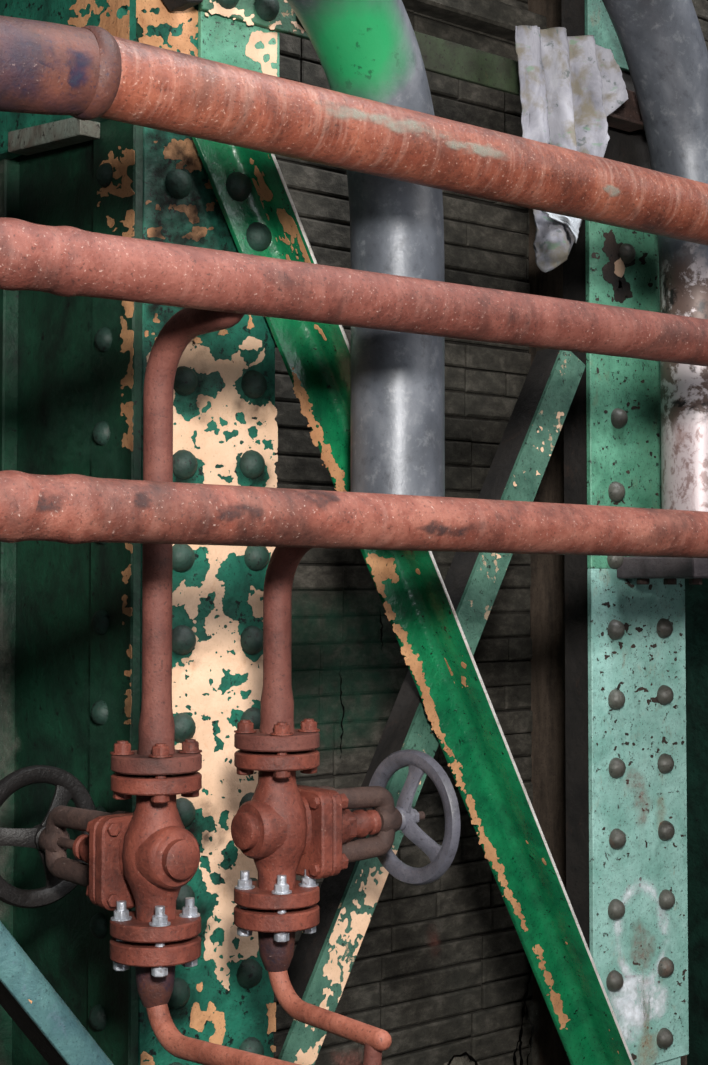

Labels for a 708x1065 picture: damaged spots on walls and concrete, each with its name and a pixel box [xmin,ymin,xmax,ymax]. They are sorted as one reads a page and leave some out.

peeling [68,0,305,77]
peeling [145,138,218,237]
peeling [173,315,278,488]
peeling [292,367,347,492]
peeling [172,545,263,991]
peeling [366,553,528,932]
peeling [189,982,226,1045]
peeling [266,1002,276,1052]
peeling [294,1024,326,1065]
peeling [319,867,389,1010]
peeling [532,944,570,1030]
water stain [614,963,665,1038]